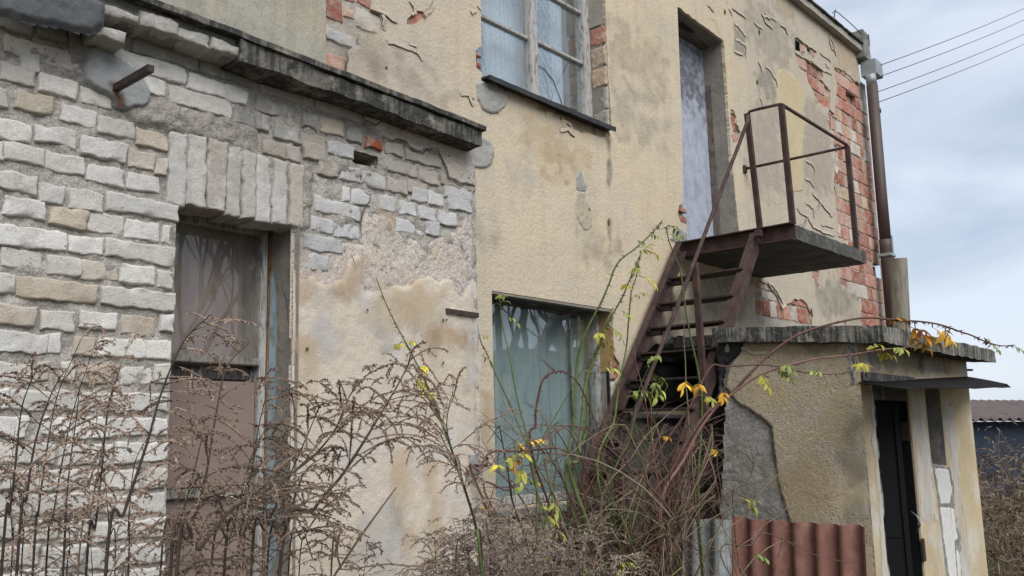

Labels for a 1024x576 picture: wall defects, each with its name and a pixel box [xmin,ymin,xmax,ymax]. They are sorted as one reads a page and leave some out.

spalling [326,0,388,71]
spalling [537,26,610,137]
peeling [363,116,475,186]
spalling [795,38,886,327]
spalling [752,277,813,327]
spalling [603,418,686,576]
spalling [674,398,788,522]